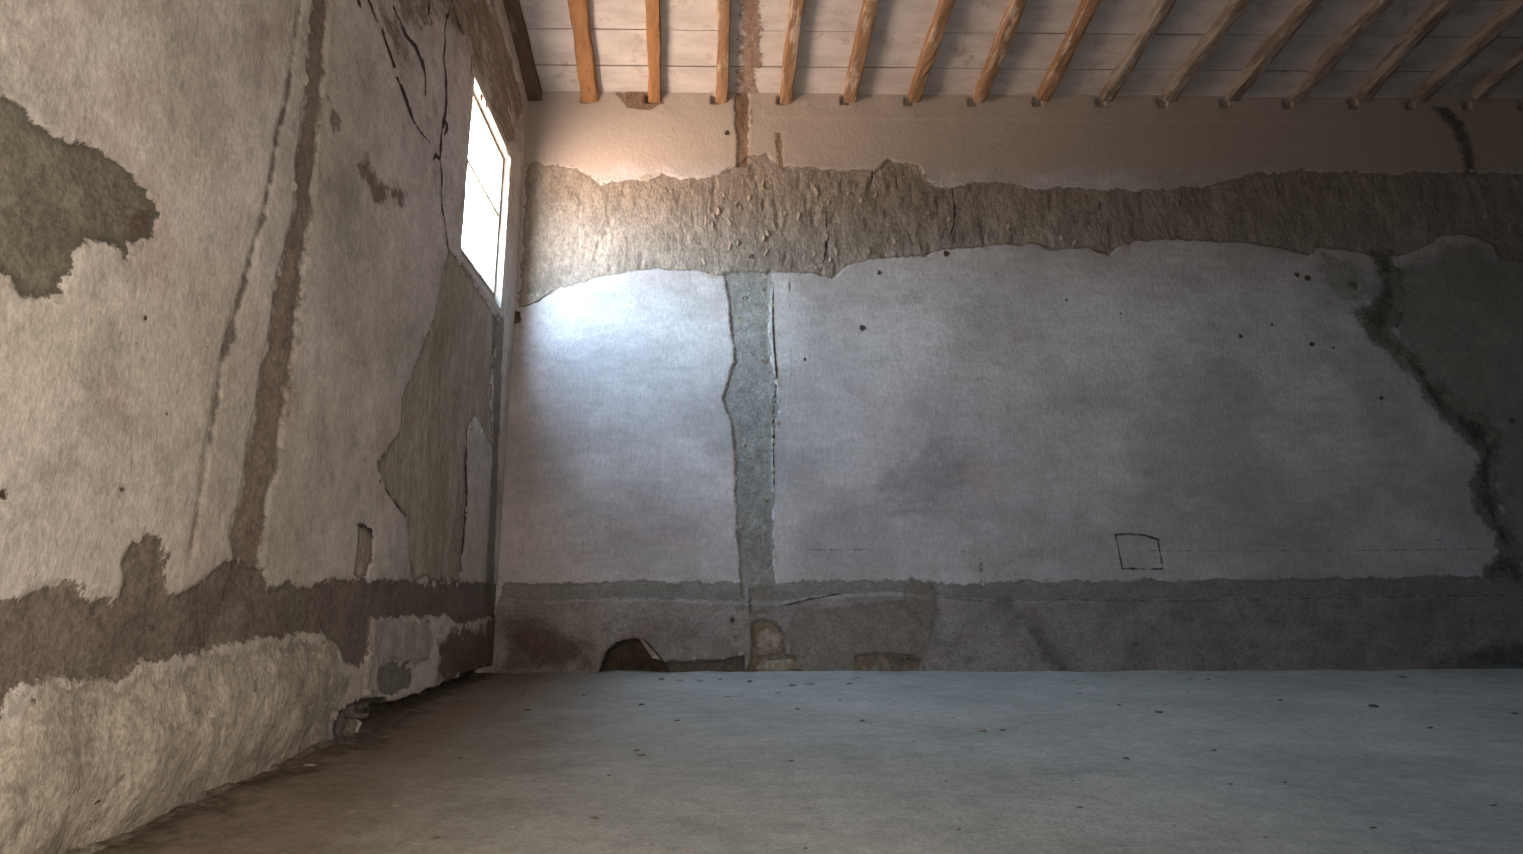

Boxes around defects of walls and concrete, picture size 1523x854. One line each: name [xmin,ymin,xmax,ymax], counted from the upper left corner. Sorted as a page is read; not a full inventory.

flaking render [0,95,160,304]
flaking render [328,97,341,132]
crack [357,0,472,253]
flaking render [0,150,1523,741]
damp [483,246,1523,673]